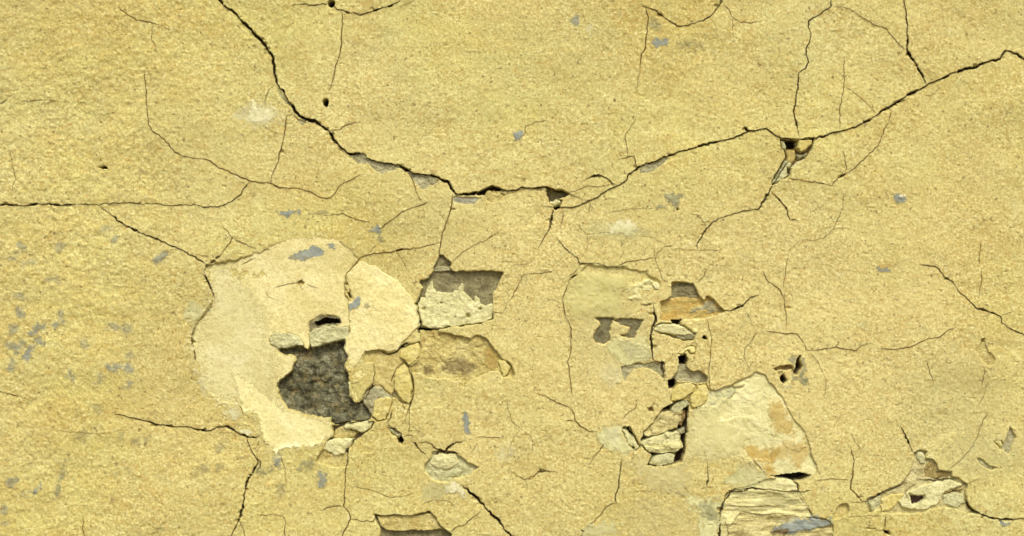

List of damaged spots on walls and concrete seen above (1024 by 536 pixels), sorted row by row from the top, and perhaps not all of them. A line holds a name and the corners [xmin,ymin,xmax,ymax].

crack [0,0,1024,391]
spalling [771,140,812,185]
crack [116,397,286,536]
peeling [188,236,511,467]
crack [324,450,410,536]
flaking render [376,511,451,536]
crack [351,343,516,455]
crack [452,486,511,536]
flaking render [593,318,643,344]
flaking render [621,279,817,478]
crack [645,373,1024,536]
flaking render [865,450,977,513]